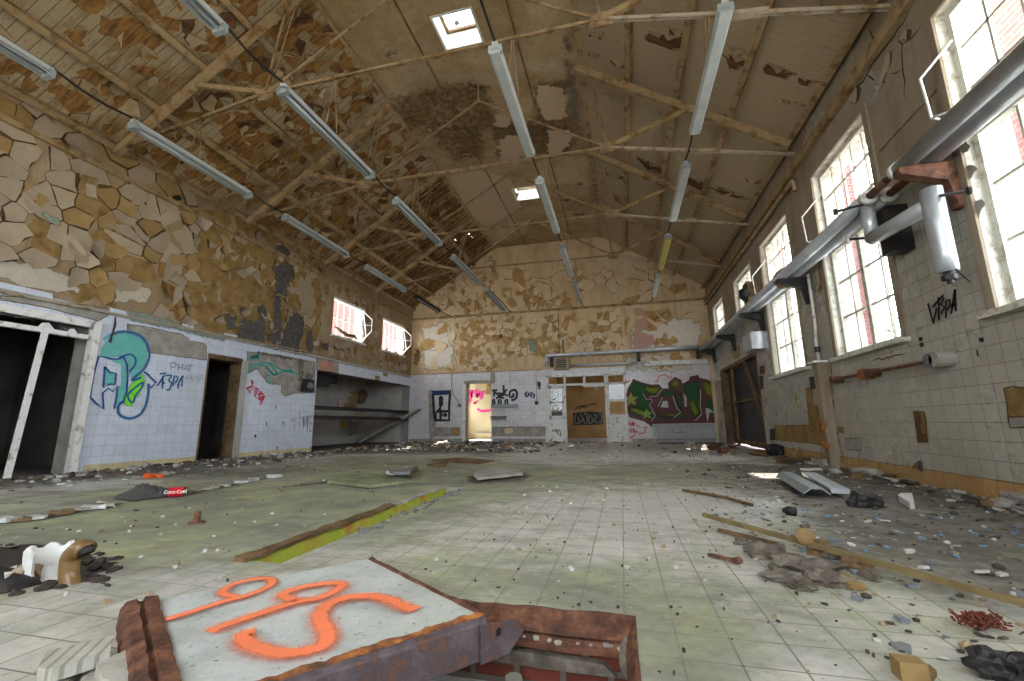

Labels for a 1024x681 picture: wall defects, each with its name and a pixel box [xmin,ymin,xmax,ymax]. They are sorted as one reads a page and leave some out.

damp [391,38,582,160]
peeling [722,53,745,70]
peeling [762,63,820,87]
crack [857,8,920,96]
peeling [0,0,705,396]
peeling [687,177,752,200]
damp [127,244,329,391]
peeling [770,387,823,445]
peeling [913,410,929,443]
peeling [1003,386,1024,428]